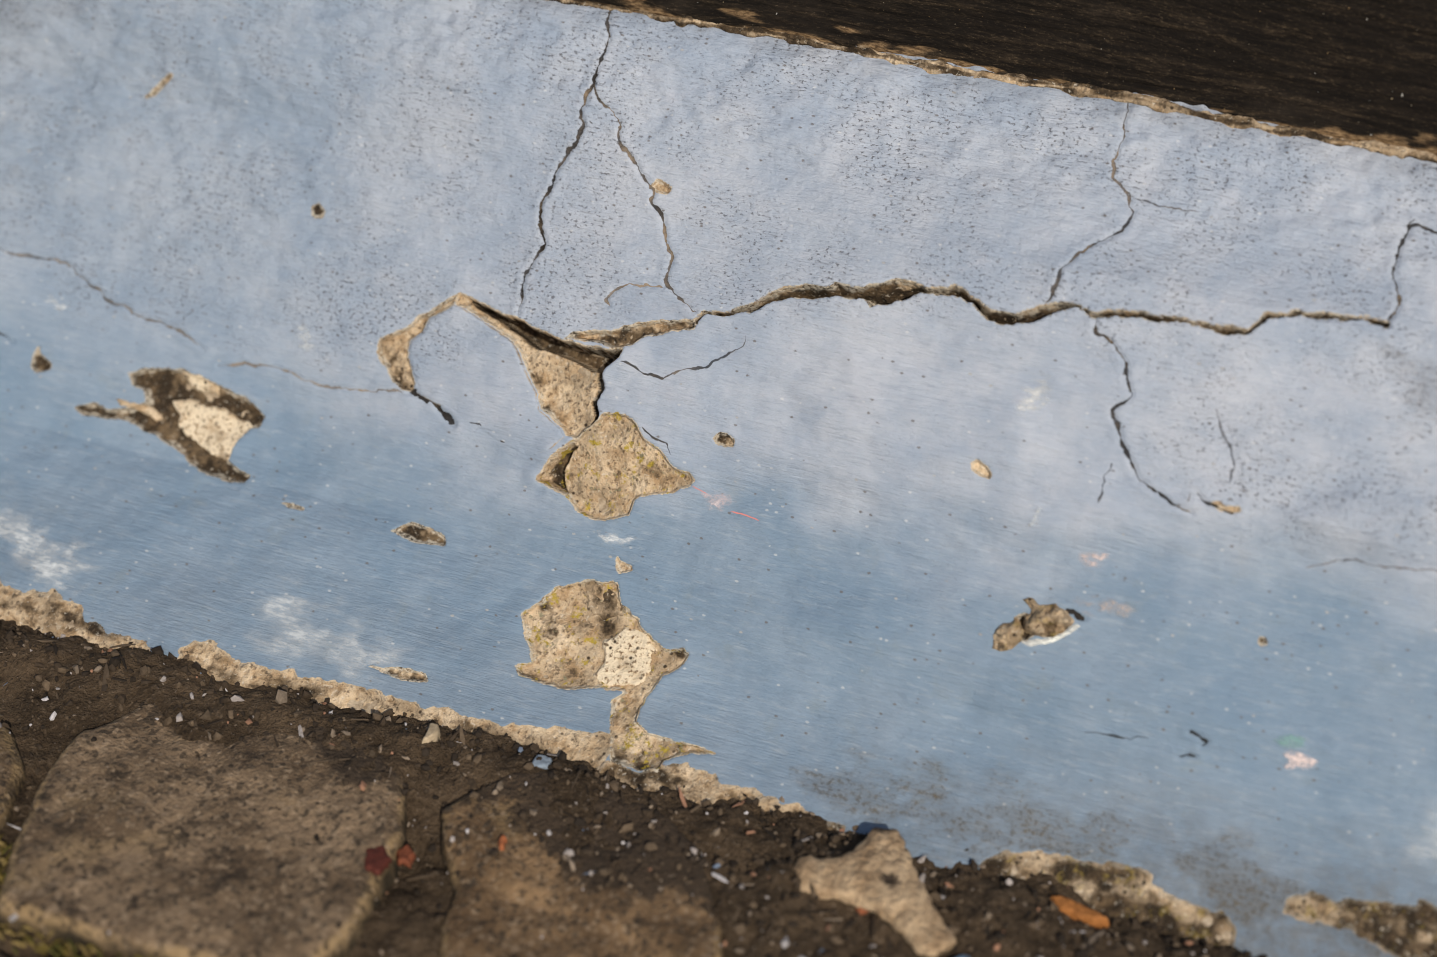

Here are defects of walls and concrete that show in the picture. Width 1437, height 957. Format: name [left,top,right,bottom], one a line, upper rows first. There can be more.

crack [43,258,190,338]
crack [518,11,1437,515]
spalling [75,368,265,483]
spalling [376,292,695,521]
spalling [391,522,446,547]
spalling [992,597,1085,651]
spalling [177,556,810,813]
peeling [826,821,846,832]
peeling [980,849,1236,947]
peeling [1283,890,1437,957]